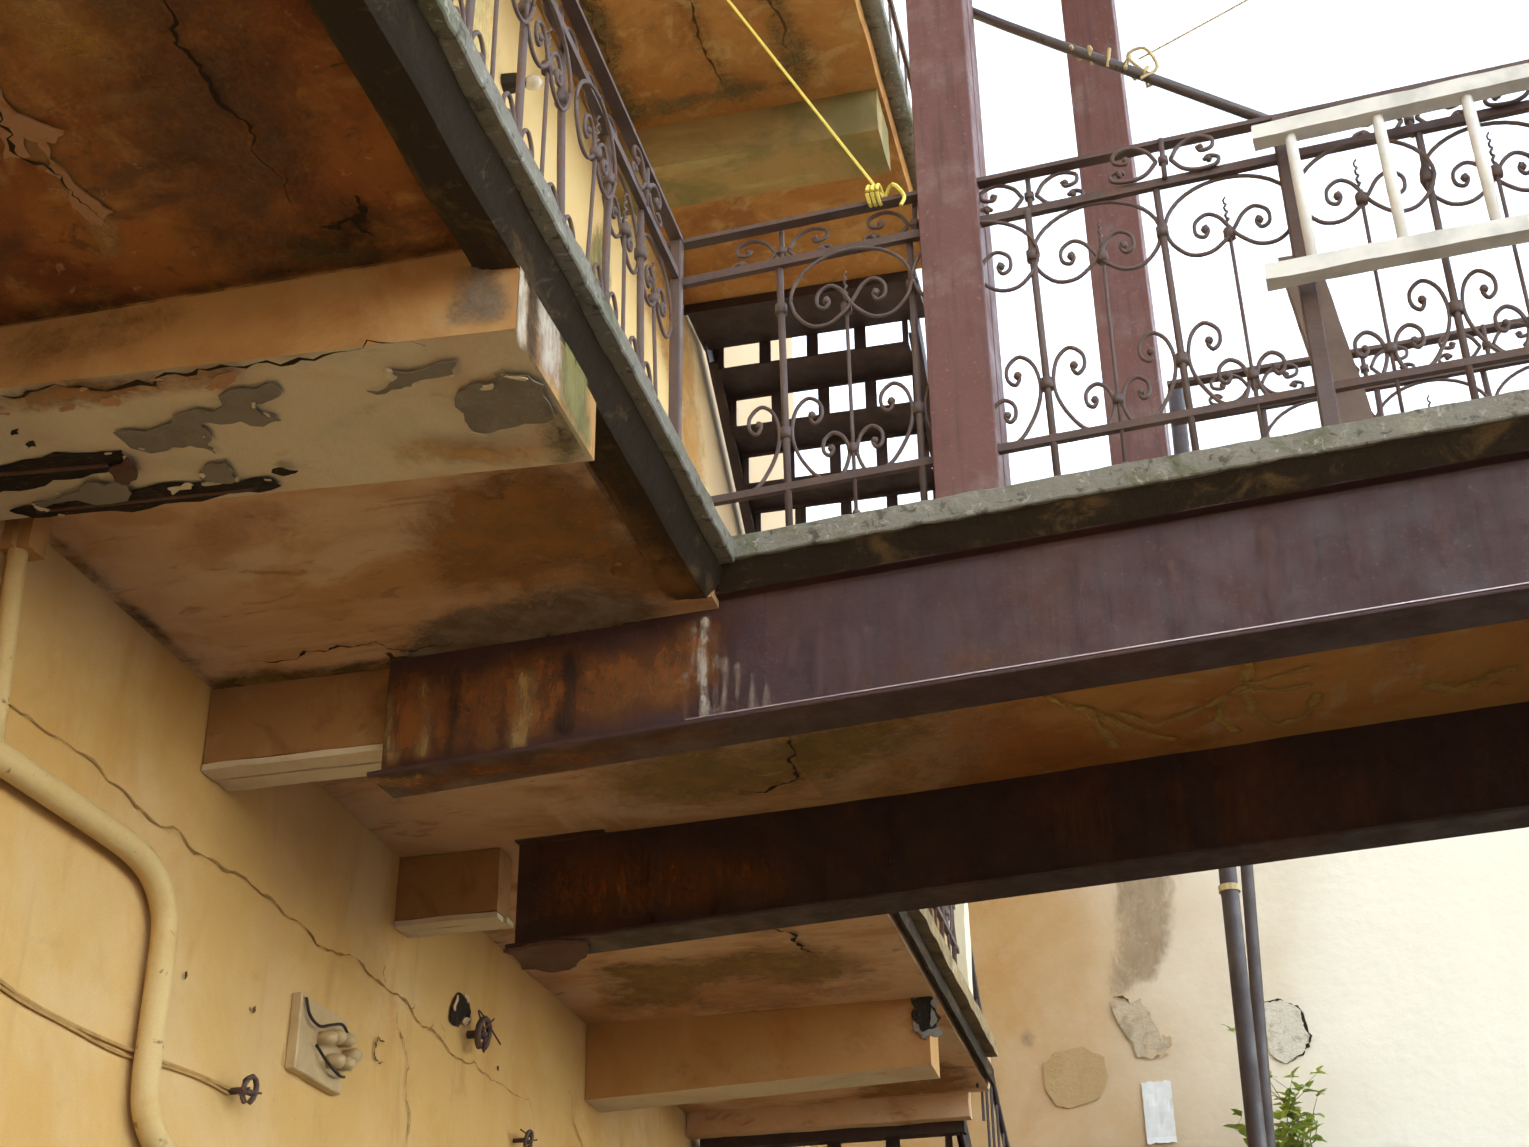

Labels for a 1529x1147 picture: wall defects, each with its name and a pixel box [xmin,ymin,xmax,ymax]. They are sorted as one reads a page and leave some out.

peeling [0,89,116,253]
crack [163,0,373,237]
peeling [0,371,298,518]
peeling [367,361,554,437]
leakage [213,443,690,690]
crack [264,638,463,663]
corrosion [382,623,720,767]
crack [9,704,535,1144]
spalling [1111,998,1172,1059]